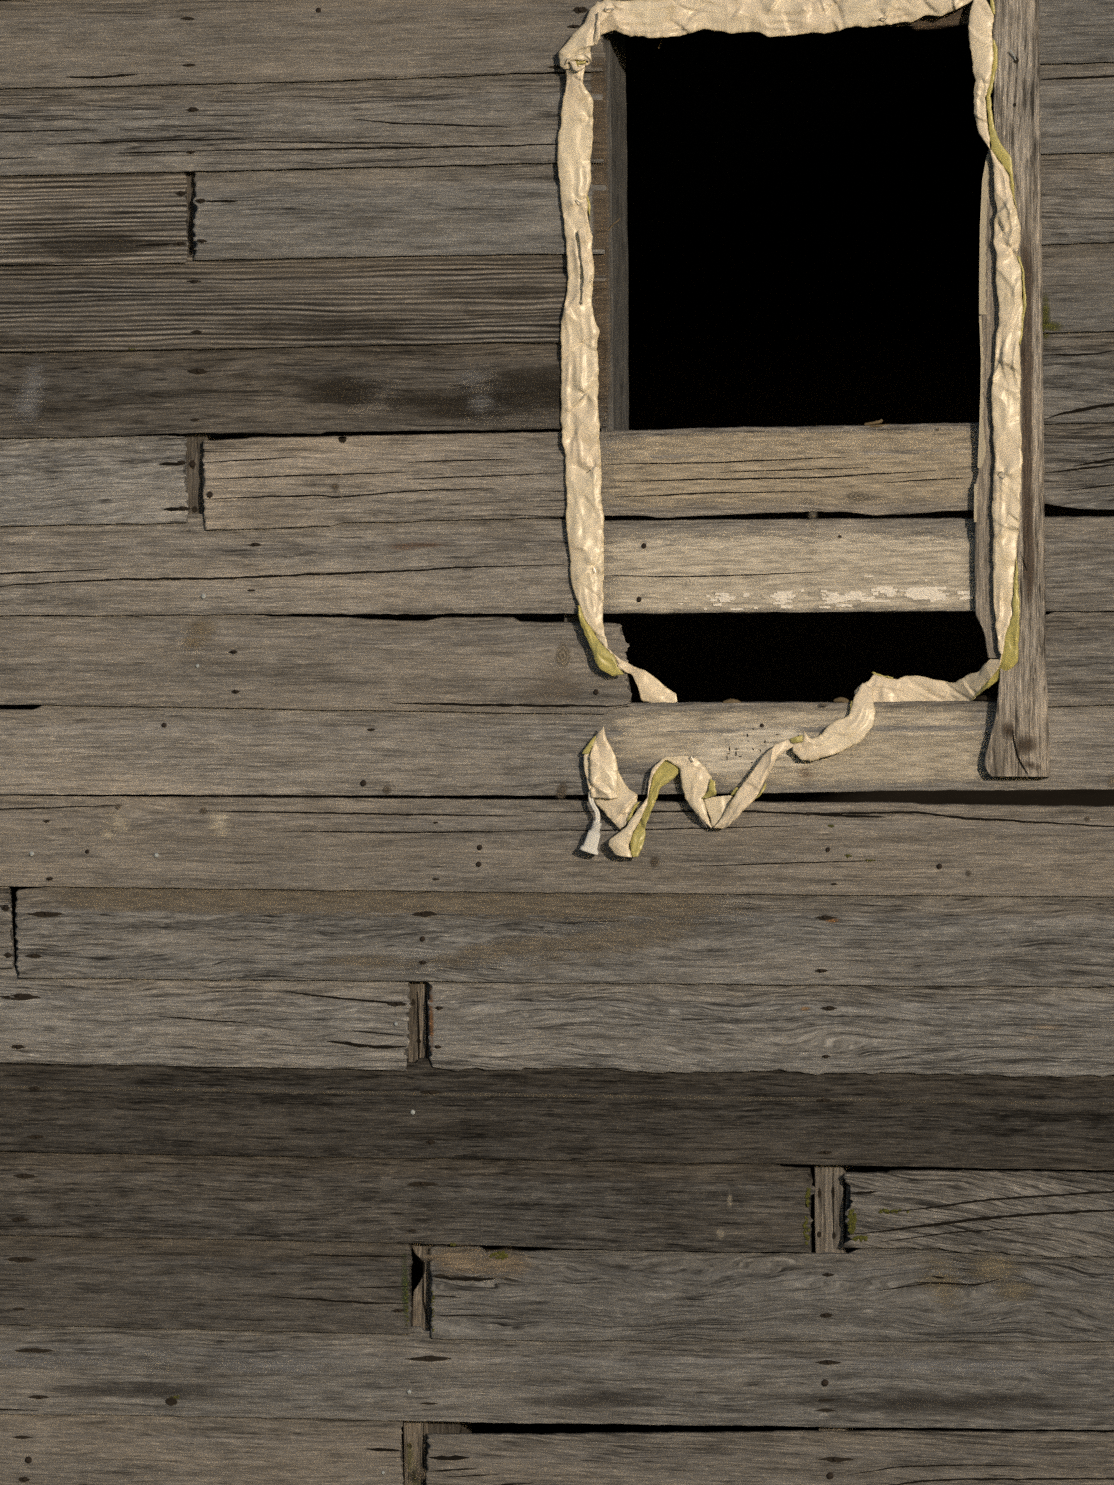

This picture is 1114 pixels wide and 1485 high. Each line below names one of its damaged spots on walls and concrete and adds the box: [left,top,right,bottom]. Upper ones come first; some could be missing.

peeling [704,575,973,610]
crack [833,1168,1114,1249]
crack [879,1276,1001,1291]